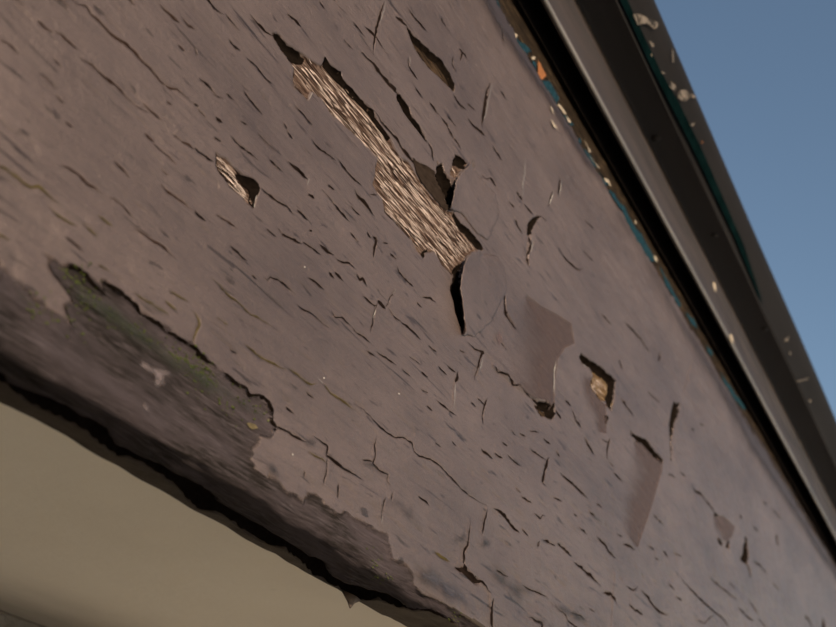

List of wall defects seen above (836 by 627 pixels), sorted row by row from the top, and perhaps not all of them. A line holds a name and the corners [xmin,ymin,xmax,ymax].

crack [0,165,177,260]
peeling [216,154,260,208]
peeling [0,255,479,627]
crack [38,0,532,420]
peeling [273,26,507,337]
crack [231,344,779,627]
crack [509,170,562,266]
crack [601,313,661,361]
peeling [497,0,836,568]